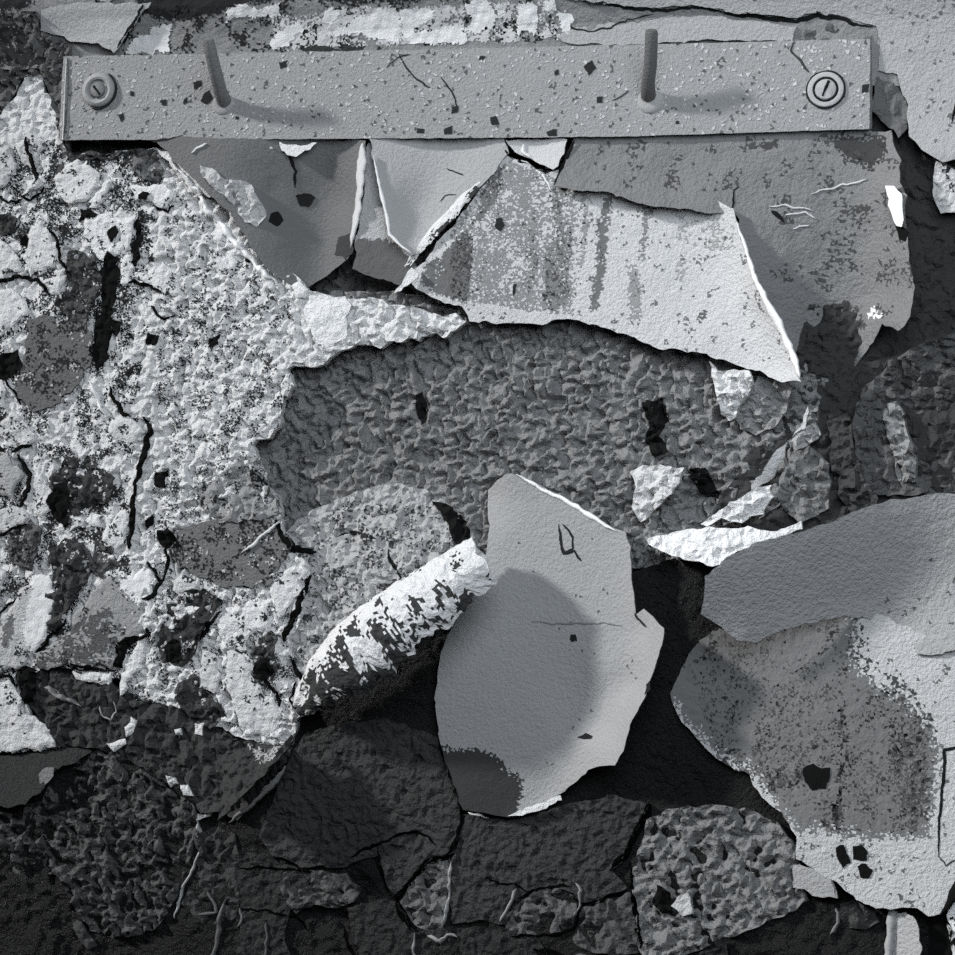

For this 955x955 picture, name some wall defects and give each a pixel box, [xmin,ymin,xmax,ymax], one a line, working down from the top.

spalling [299,42,364,52]
crack [570,0,873,72]
peeling [183,80,213,104]
flaking render [0,126,45,188]
flaking render [131,183,174,209]
spalling [0,141,164,413]
flaking render [136,261,182,296]
flaking render [105,415,146,445]
flaking render [0,412,129,679]
spalling [152,130,955,955]
flaking render [142,594,152,622]
spalling [0,599,295,939]